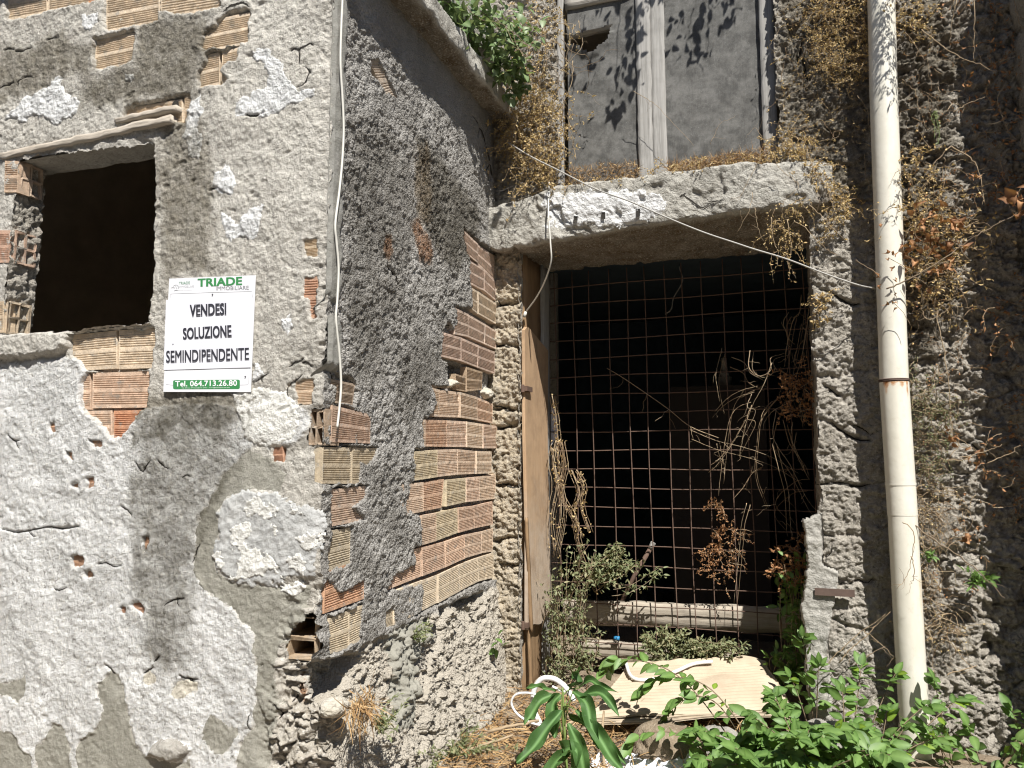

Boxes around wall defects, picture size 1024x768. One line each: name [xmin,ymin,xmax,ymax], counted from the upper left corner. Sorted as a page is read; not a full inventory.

peeling [5,0,315,159]
crack [291,43,314,87]
spalling [304,239,318,257]
spalling [304,276,319,319]
spalling [72,328,156,447]
spalling [386,231,497,627]
crack [2,526,78,537]
peeling [0,669,190,768]